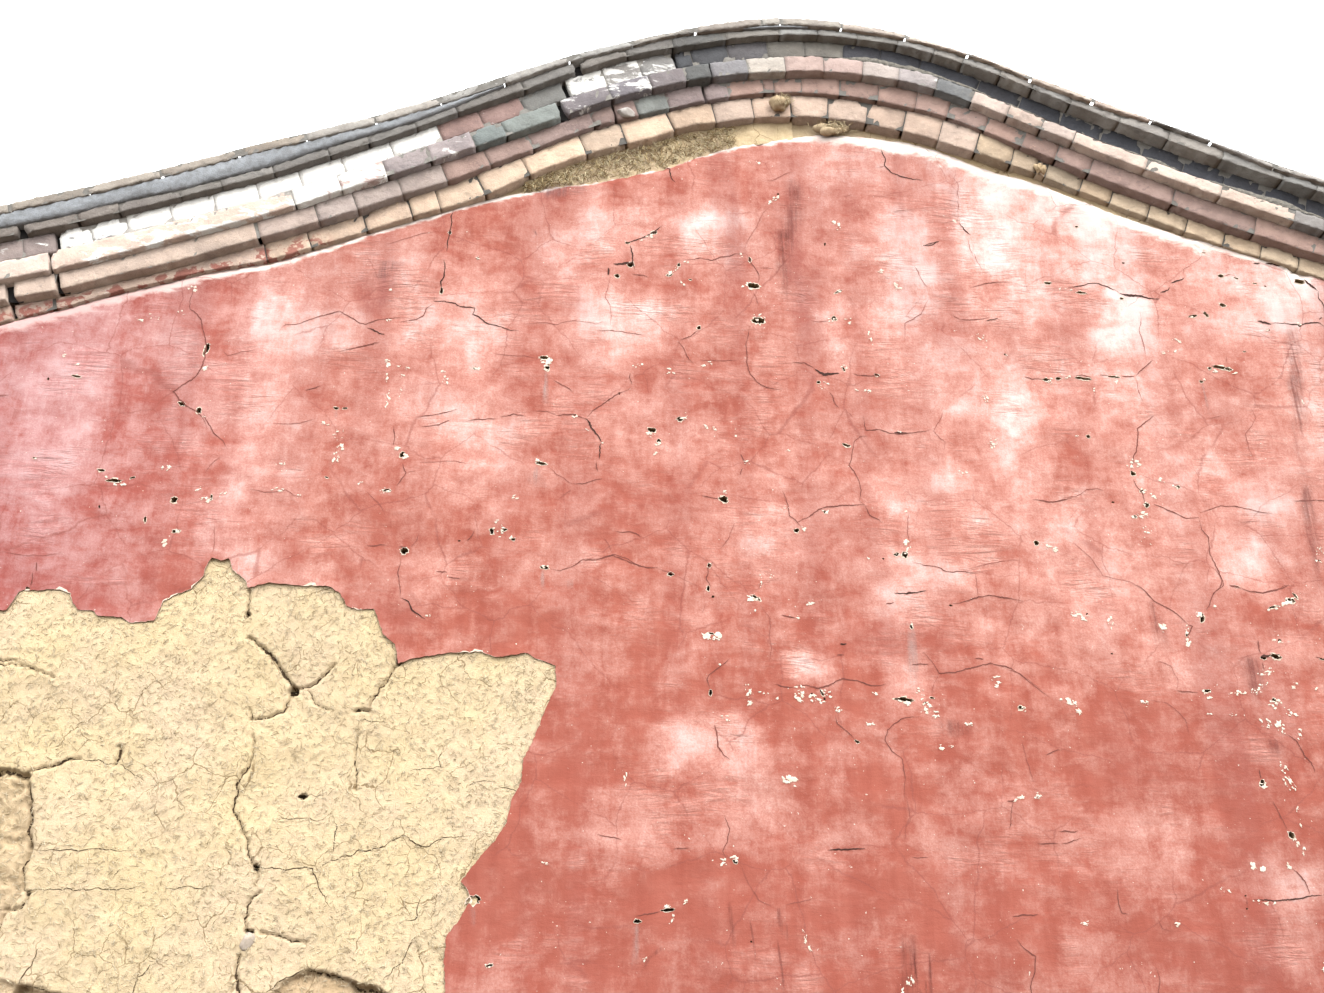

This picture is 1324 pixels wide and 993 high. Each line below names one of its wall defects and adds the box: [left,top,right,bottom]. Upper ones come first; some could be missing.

crack [7,287,24,319]
crack [20,230,71,294]
crack [172,290,251,471]
crack [285,213,660,510]
crack [680,172,1021,606]
crack [540,455,750,613]
crack [1033,263,1324,733]
crack [0,749,143,928]
crack [232,598,463,993]
crack [633,899,688,924]
crack [747,594,928,858]
crack [1220,769,1321,906]